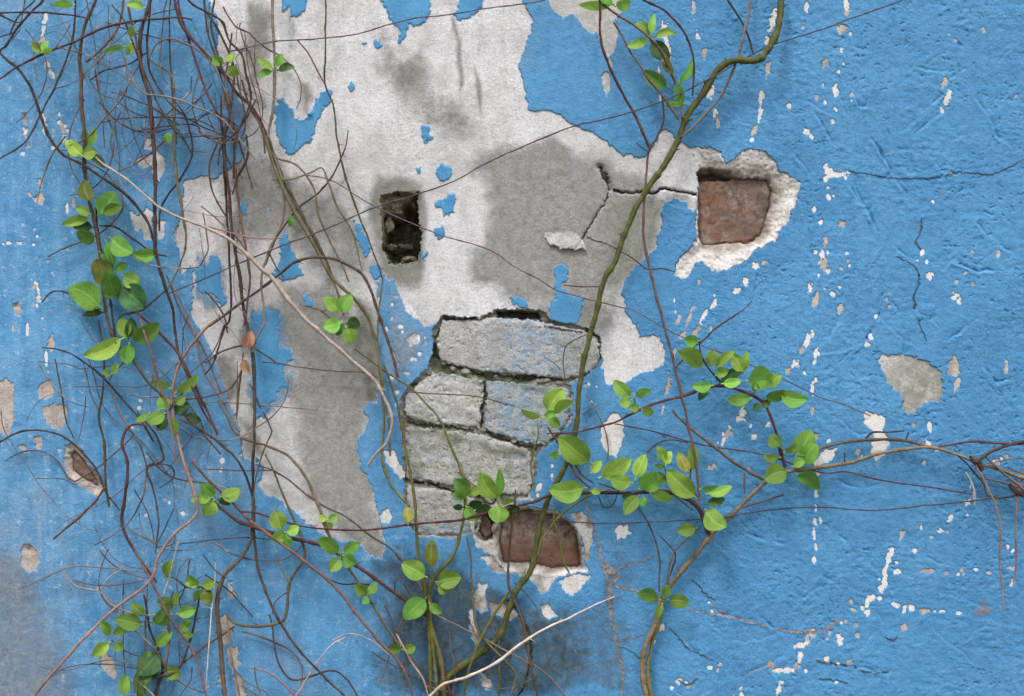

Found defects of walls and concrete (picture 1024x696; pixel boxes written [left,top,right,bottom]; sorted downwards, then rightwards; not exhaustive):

spalling [815,0,854,124]
crack [582,166,696,248]
crack [848,159,1024,180]
crack [897,217,931,341]
peeling [130,0,801,645]
peeling [0,378,16,436]
peeling [38,334,67,430]
peeling [878,354,961,466]
spalling [64,444,103,497]
spalling [21,544,40,572]
peeling [217,613,247,696]
peeling [480,672,493,690]